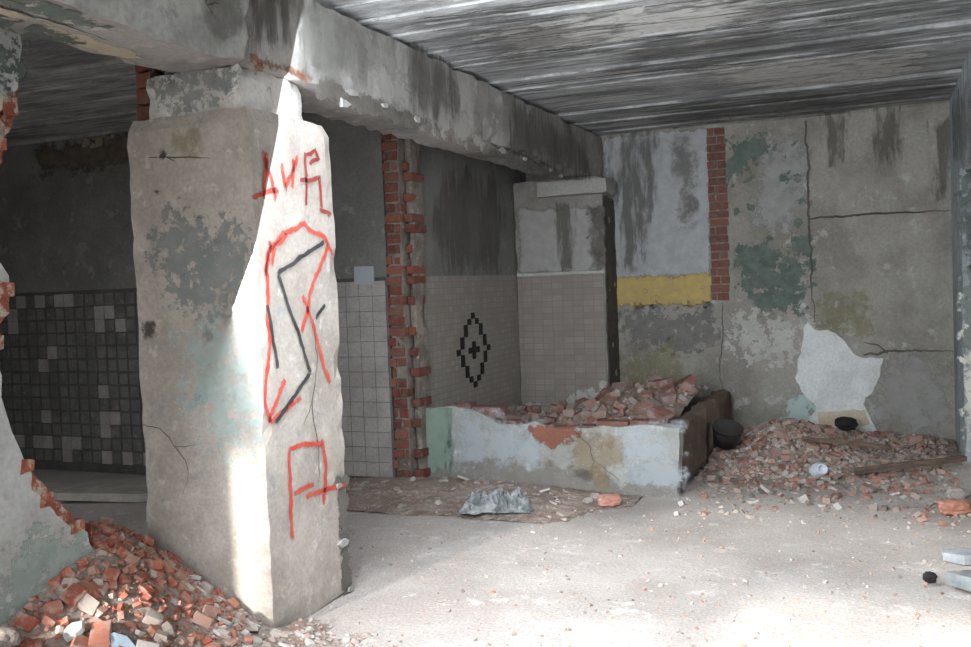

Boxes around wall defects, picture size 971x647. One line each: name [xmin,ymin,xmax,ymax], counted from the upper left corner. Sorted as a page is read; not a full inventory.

peeling [0,0,144,164]
crack [424,0,951,115]
spalling [142,321,155,338]
crack [491,143,563,172]
leakage [612,132,656,267]
leakage [672,137,698,218]
flaking render [586,127,883,433]
crack [804,121,950,322]
peeling [955,169,971,453]
flaking render [526,424,582,449]